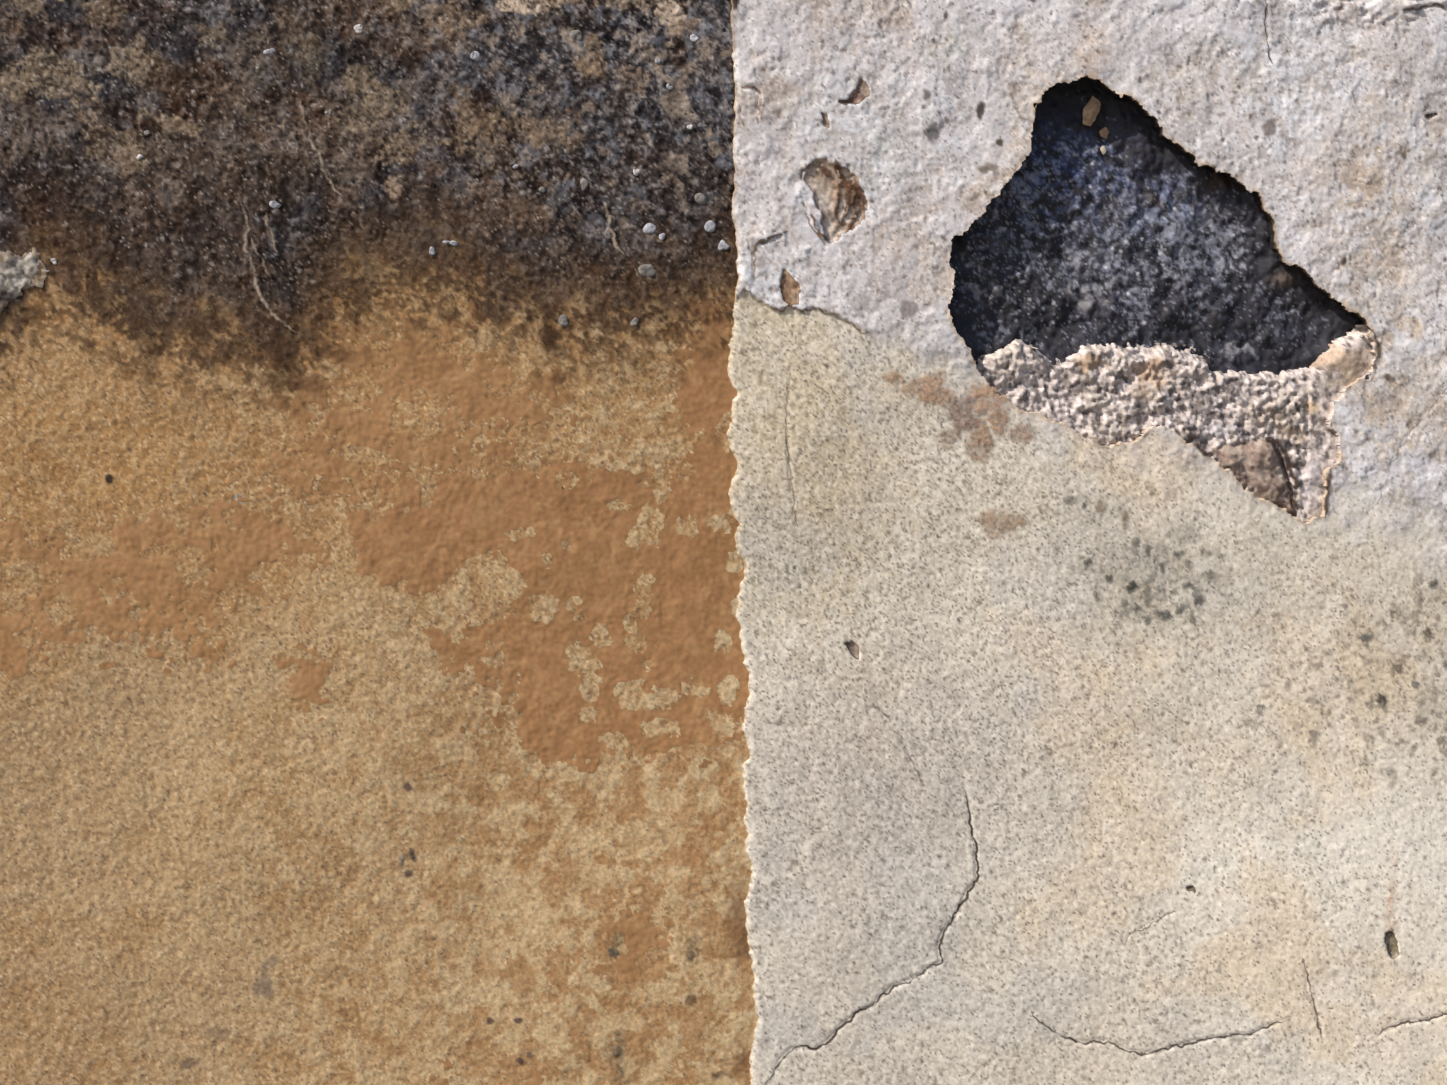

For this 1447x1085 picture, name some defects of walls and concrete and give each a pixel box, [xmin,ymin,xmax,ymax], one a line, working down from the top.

crack [1264,0,1273,64]
crack [1403,3,1446,15]
damp [0,0,738,390]
spalling [948,76,1381,523]
crack [765,790,979,1085]
crack [1032,958,1321,1056]
crack [1378,1013,1447,1035]